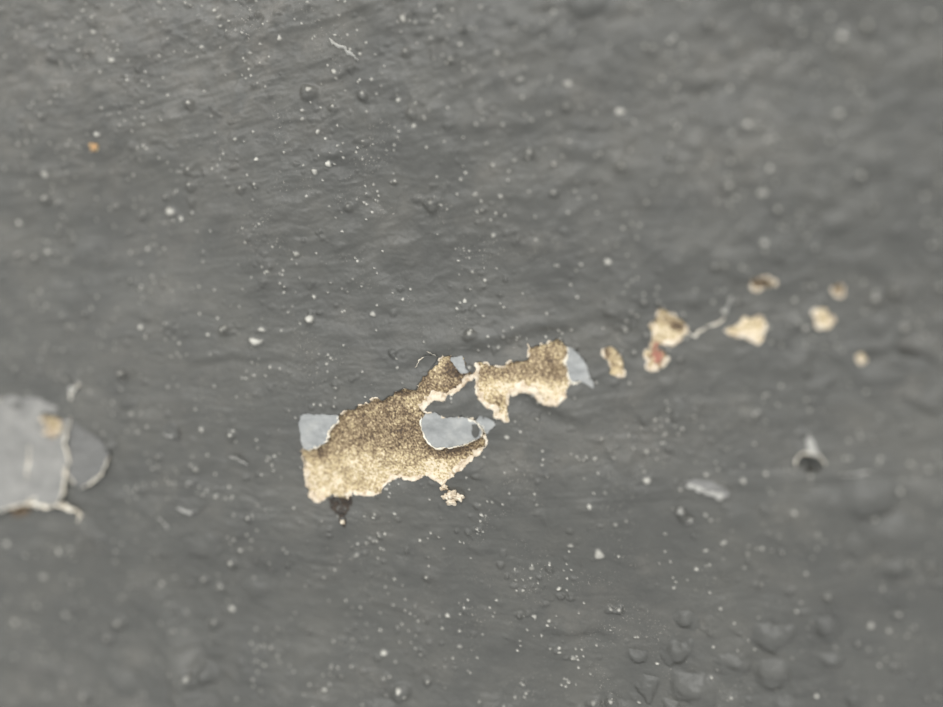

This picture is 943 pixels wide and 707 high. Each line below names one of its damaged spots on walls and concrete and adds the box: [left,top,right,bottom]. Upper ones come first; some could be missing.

peeling [749,276,778,293]
peeling [831,284,845,298]
peeling [643,308,688,372]
peeling [725,315,767,345]
peeling [811,308,836,330]
peeling [601,347,626,378]
peeling [298,339,594,506]
peeling [0,396,110,522]